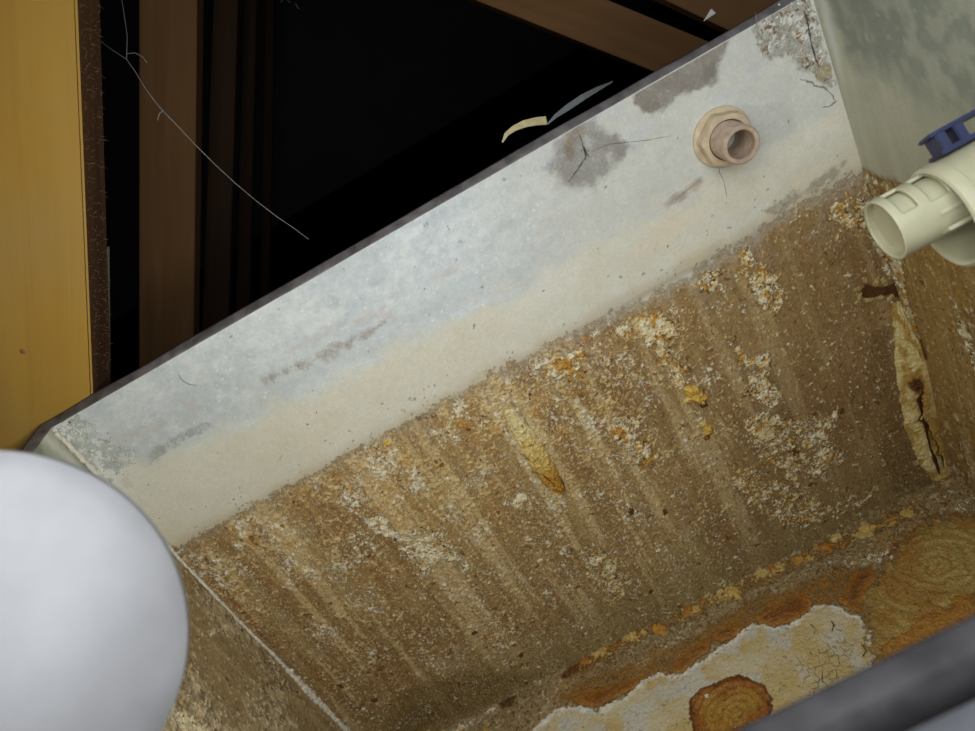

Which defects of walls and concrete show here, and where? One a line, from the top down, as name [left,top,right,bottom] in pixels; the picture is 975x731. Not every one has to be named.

crack [568,132,668,182]